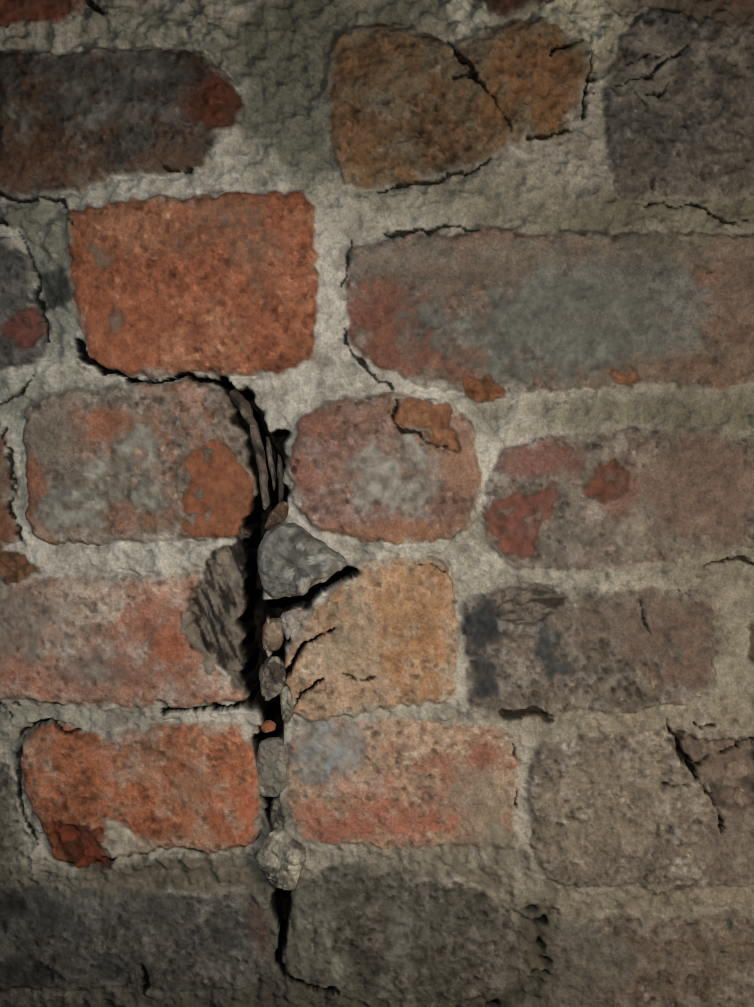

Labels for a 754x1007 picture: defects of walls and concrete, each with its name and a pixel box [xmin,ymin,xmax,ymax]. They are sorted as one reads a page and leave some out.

crack [86,0,104,15]
crack [447,41,688,141]
crack [163,166,193,174]
crack [378,159,491,193]
crack [0,192,74,343]
crack [341,240,353,287]
crack [344,329,447,447]
crack [0,375,34,541]
crack [75,339,376,751]
crack [263,796,275,820]
crack [662,719,754,830]
crack [271,887,339,992]